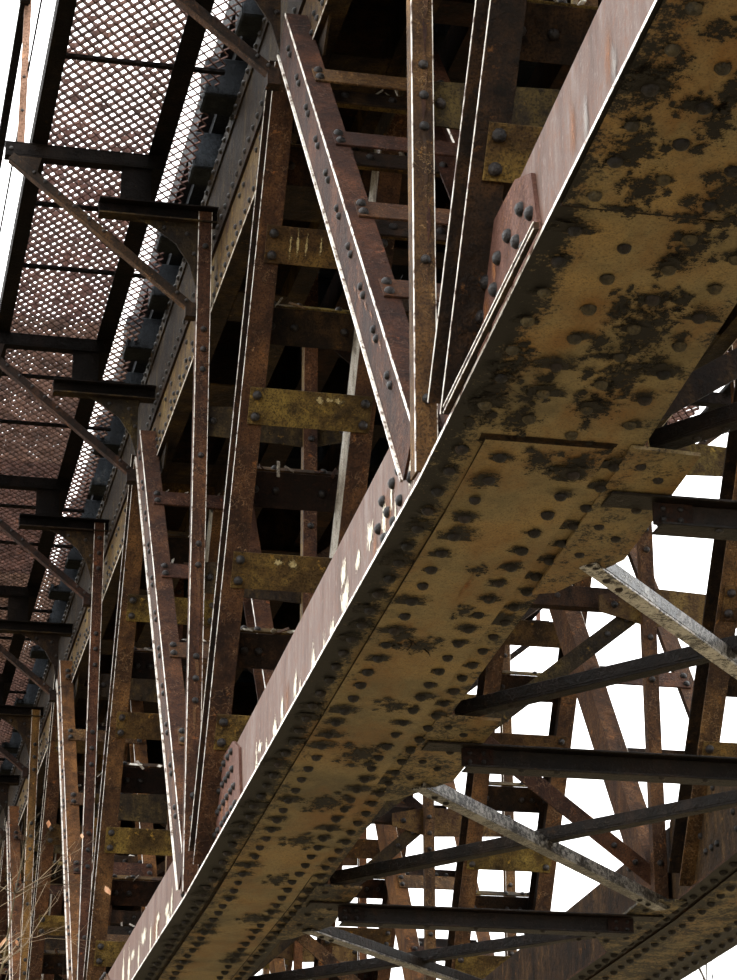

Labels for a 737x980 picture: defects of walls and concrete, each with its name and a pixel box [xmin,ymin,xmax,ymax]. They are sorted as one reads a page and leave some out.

peeling [311,489,396,667]
peeling [331,742,388,768]
peeling [122,889,173,980]